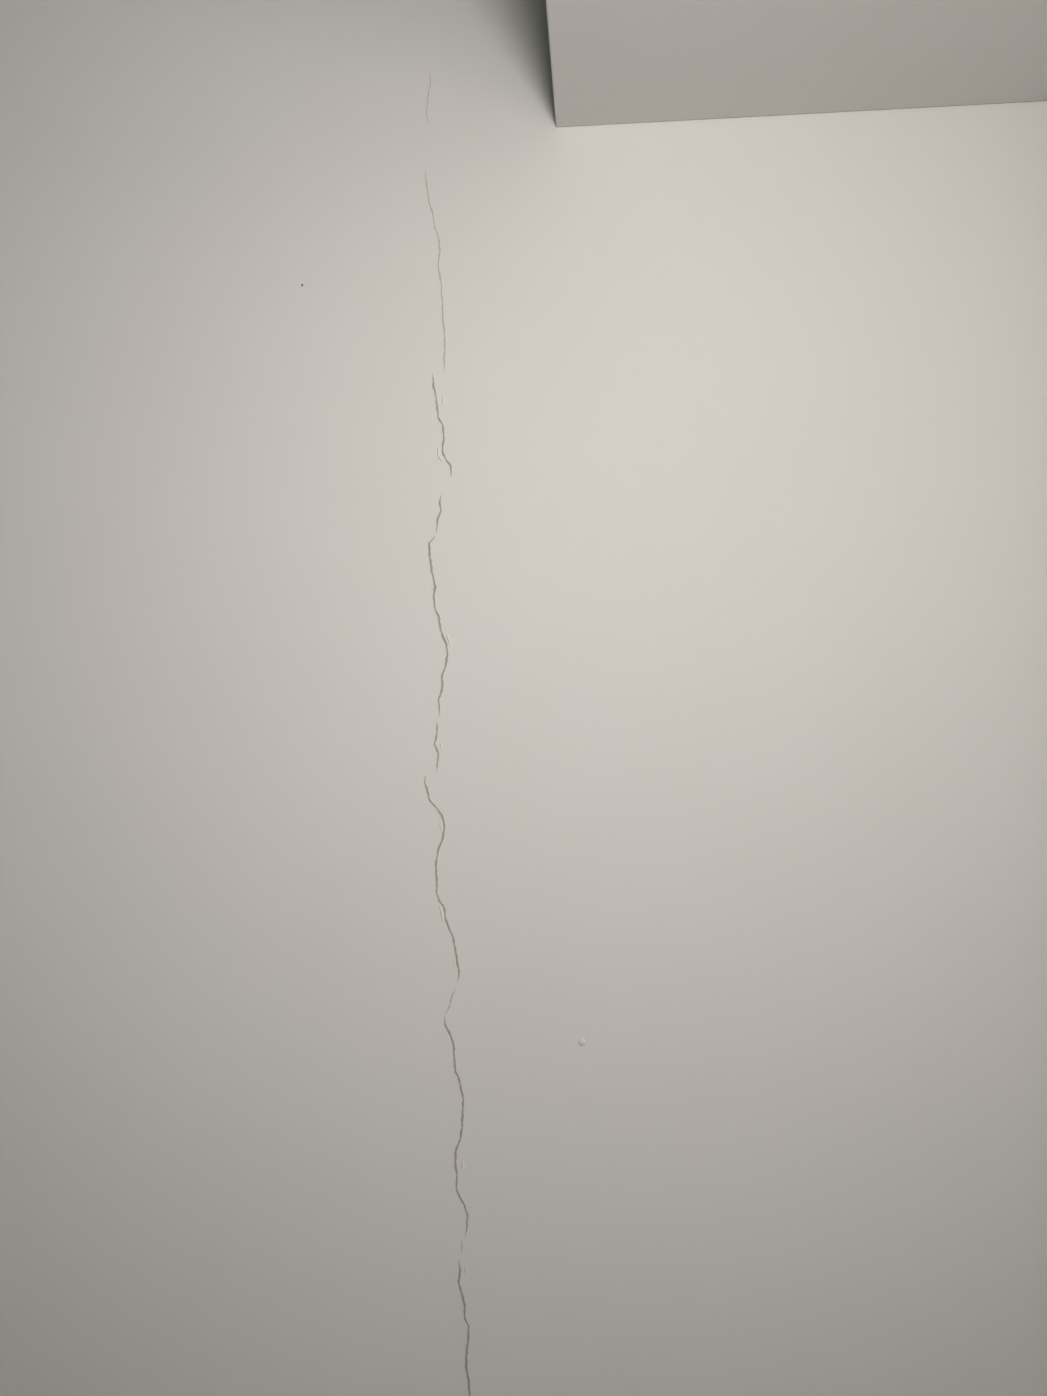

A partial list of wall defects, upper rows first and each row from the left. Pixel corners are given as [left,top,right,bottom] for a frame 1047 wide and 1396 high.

crack [424,170,472,1396]